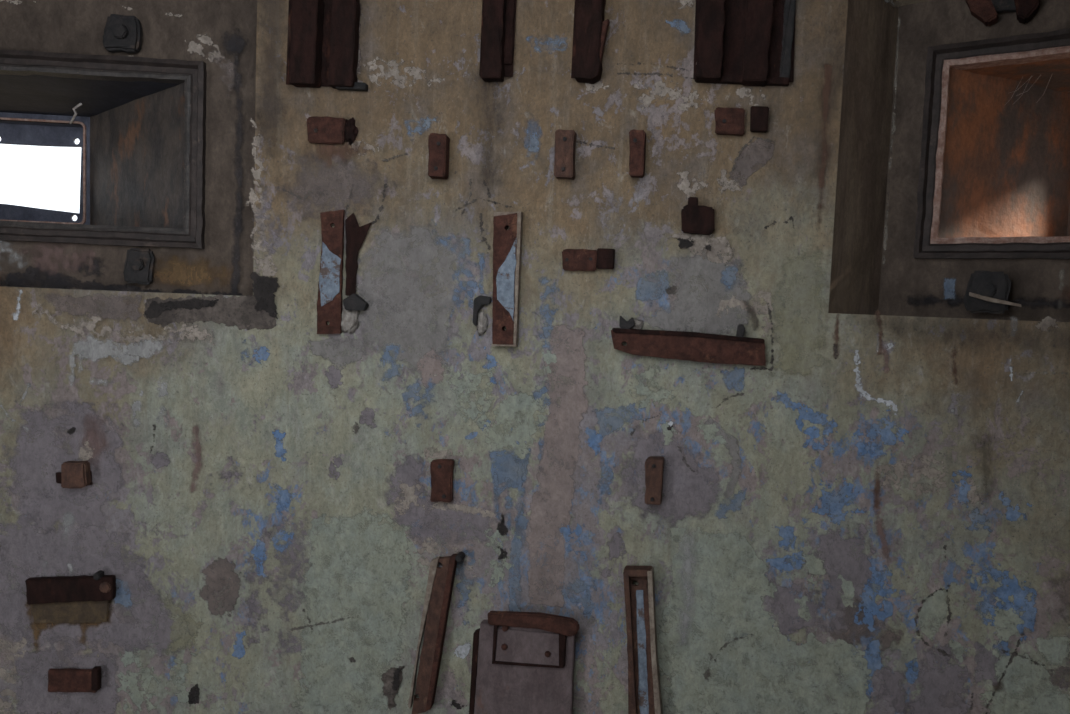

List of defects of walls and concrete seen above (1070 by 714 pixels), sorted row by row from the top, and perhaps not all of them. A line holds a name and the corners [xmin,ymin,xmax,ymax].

peeling [771,390,838,451]
corrosion [25,600,112,648]
crack [914,585,952,657]
crack [970,633,1045,714]